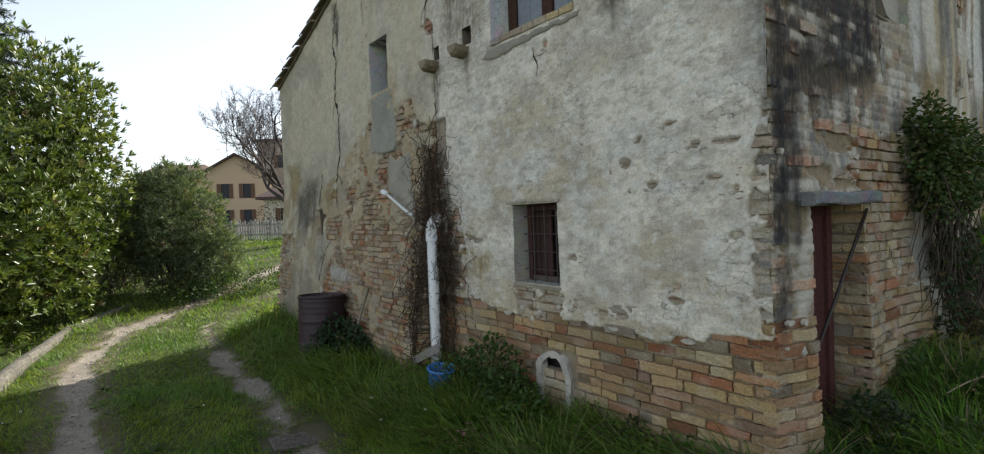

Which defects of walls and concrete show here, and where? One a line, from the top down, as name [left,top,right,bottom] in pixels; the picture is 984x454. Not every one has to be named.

crack [319,8,342,210]
water stain [770,0,876,244]
flaking render [319,86,827,454]